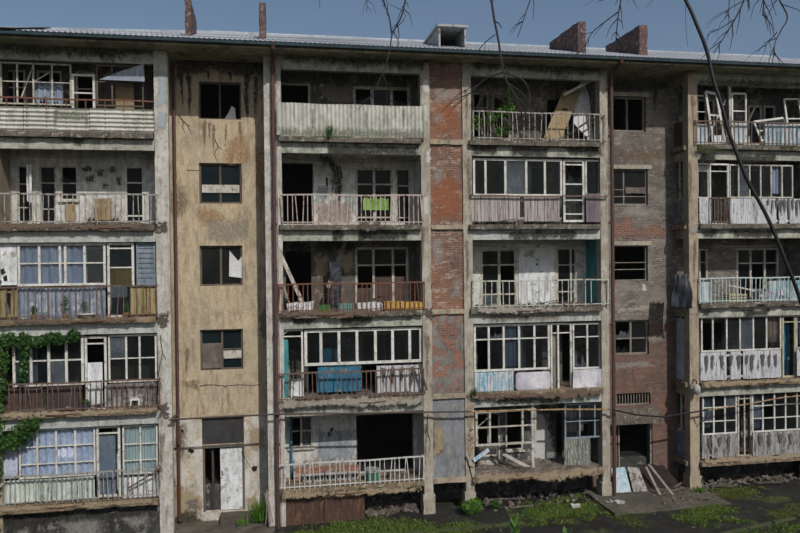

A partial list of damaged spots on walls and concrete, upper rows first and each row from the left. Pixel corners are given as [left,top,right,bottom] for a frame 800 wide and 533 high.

leakage [175,60,263,115]
peeling [381,366,414,384]
spalling [279,395,424,410]
peeling [248,428,265,450]